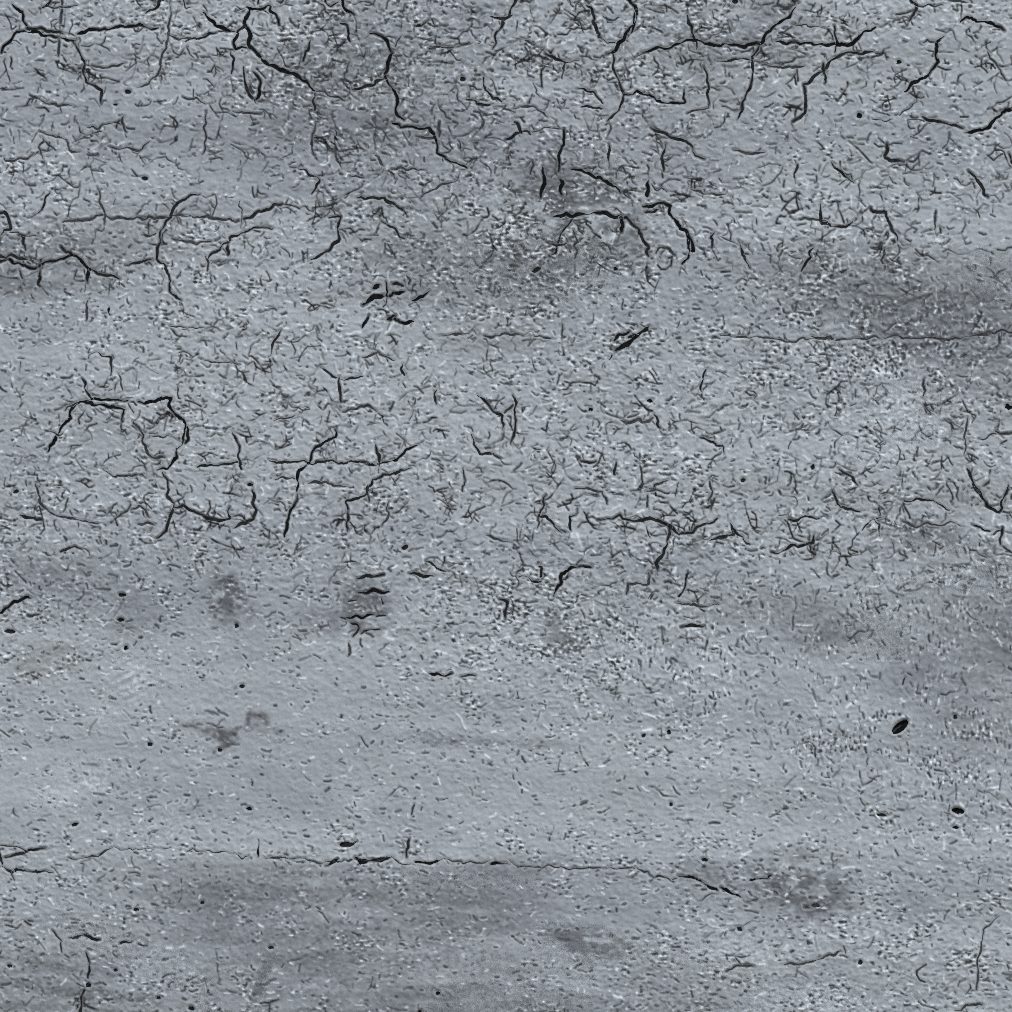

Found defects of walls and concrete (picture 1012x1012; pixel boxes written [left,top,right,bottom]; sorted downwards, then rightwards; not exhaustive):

crack [0,188,281,321]
crack [1,0,467,239]
crack [311,215,341,260]
crack [466,77,715,264]
crack [525,0,876,122]
crack [800,203,898,264]
crack [873,0,1012,163]
crack [45,351,417,538]
crack [461,395,518,492]
crack [537,417,1012,595]
crack [519,565,592,596]
crack [0,804,771,897]